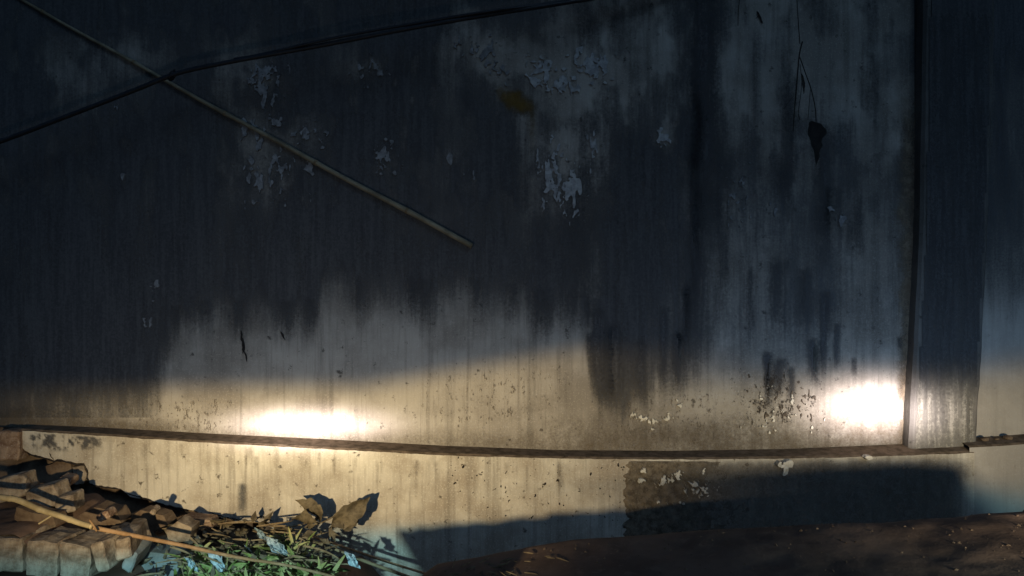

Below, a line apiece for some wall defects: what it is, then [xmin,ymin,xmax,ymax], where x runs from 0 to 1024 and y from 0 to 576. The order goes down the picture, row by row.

peeling [240,62,337,210]
water stain [0,0,903,420]
peeling [536,130,599,226]
crack [239,331,247,362]
flaking render [586,461,724,537]